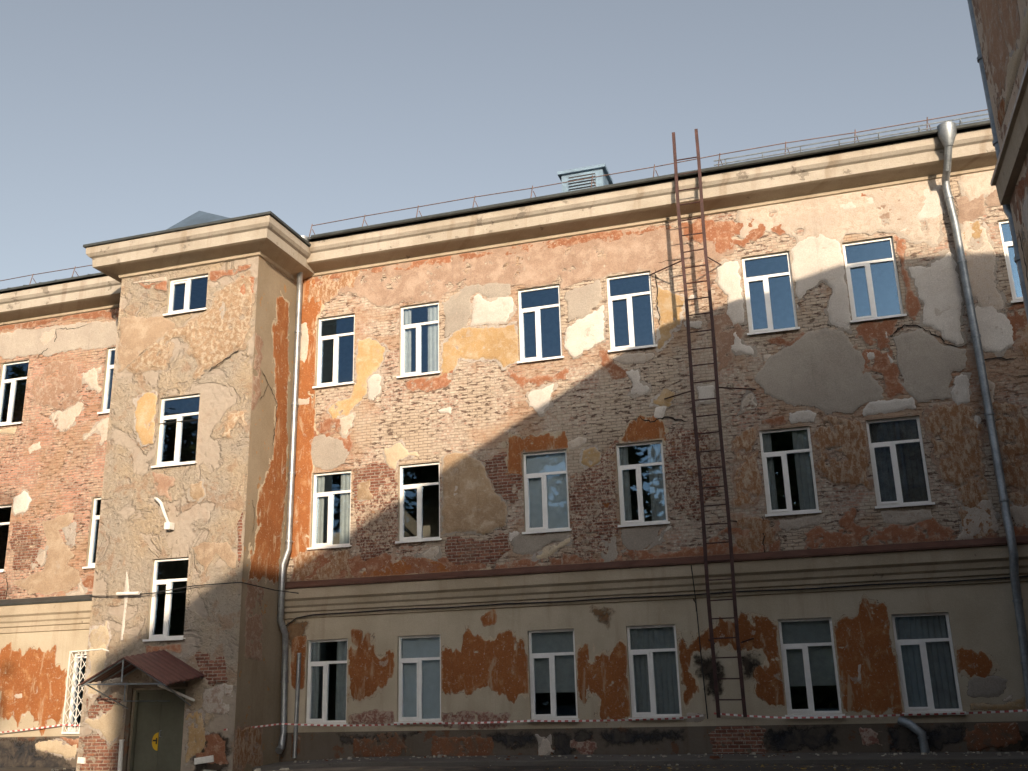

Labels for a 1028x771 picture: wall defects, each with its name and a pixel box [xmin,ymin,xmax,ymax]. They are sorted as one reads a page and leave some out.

peeling [505,219,785,256]
flaking render [117,264,255,380]
peeling [855,235,921,400]
peeling [237,251,788,585]
flaking render [804,398,1028,550]
flaking render [10,524,42,571]
peeling [0,641,123,771]
peeling [346,629,412,758]
peeling [441,609,530,730]
peeling [575,639,631,726]
peeling [676,611,786,711]
peeling [833,594,905,746]